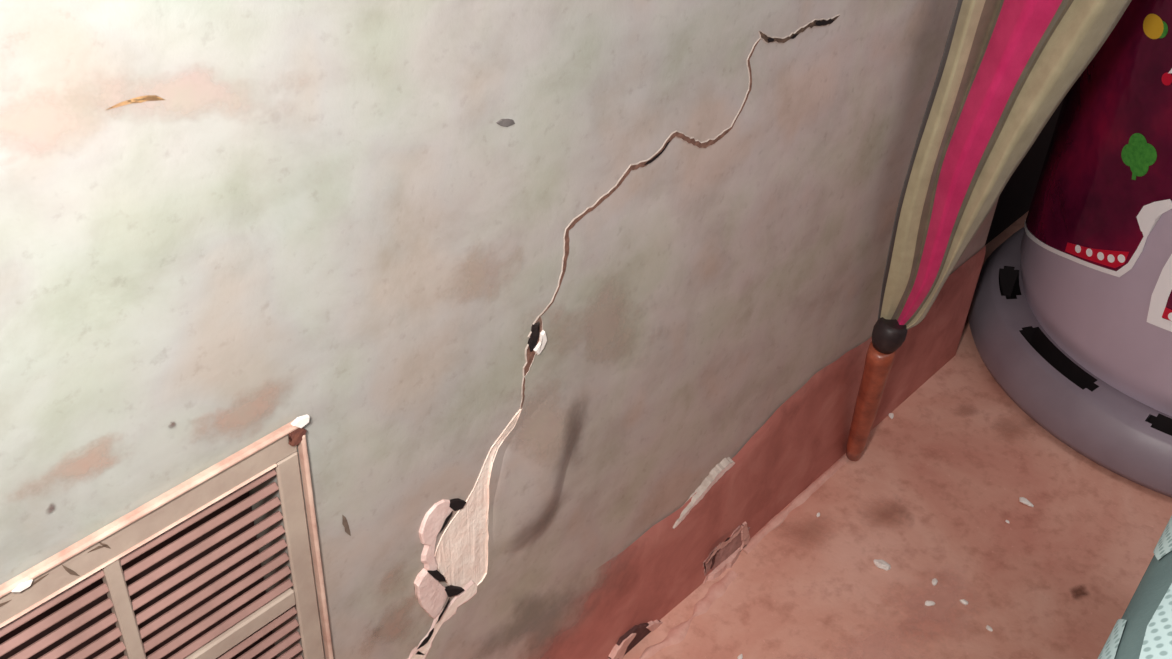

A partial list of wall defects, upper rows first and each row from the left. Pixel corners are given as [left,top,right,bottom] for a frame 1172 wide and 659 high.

crack [520,14,840,409]
flaking render [414,409,522,624]
peeling [673,457,735,529]
flaking render [703,521,750,583]
crack [408,580,477,659]
flaking render [608,619,663,659]